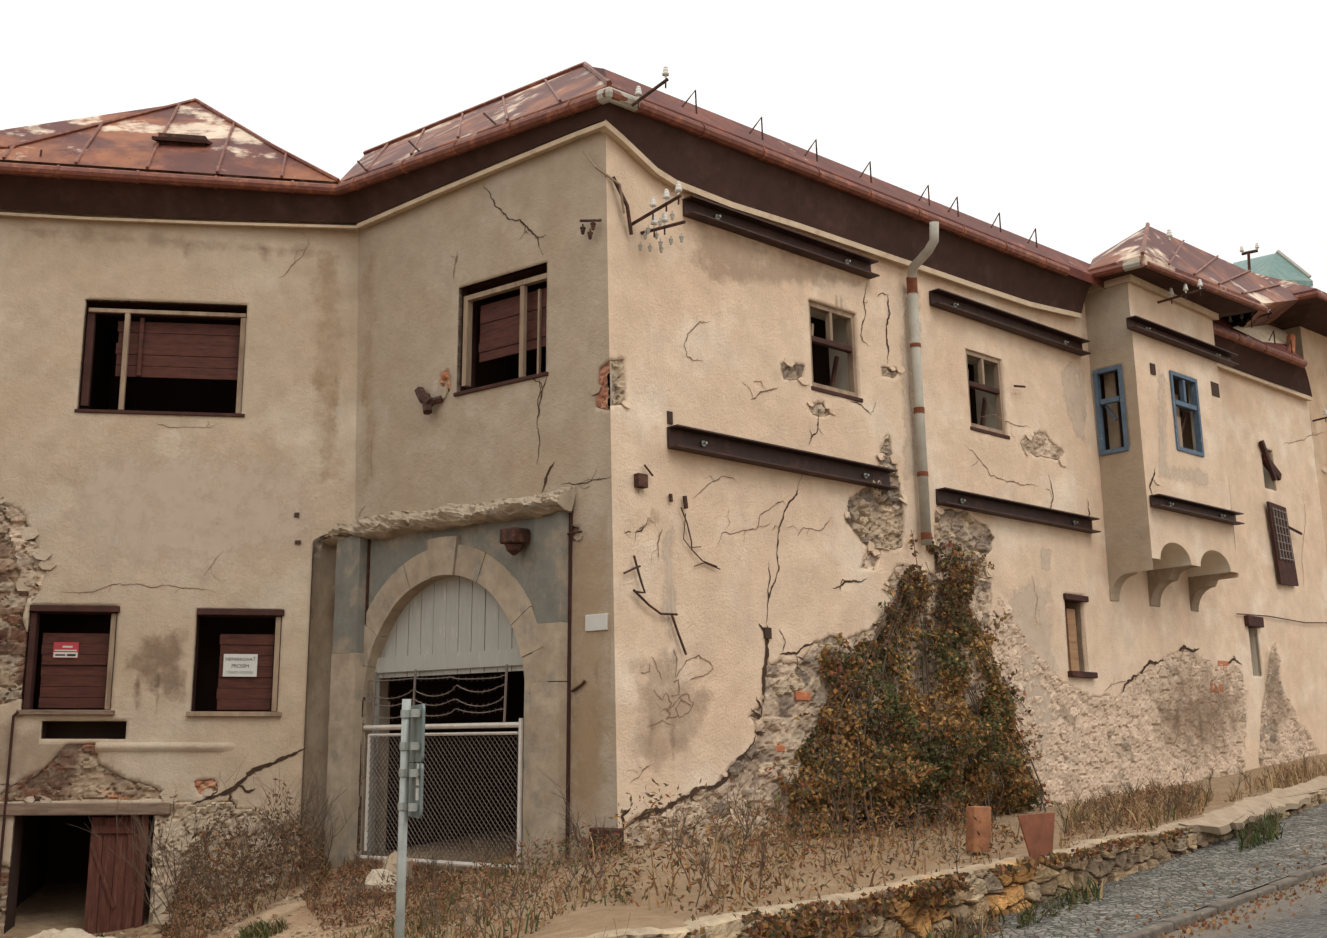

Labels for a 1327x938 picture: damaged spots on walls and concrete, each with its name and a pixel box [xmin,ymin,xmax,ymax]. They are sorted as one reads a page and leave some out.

crack [484,188,543,255]
spalling [589,360,631,410]
spalling [1020,431,1067,467]
spalling [844,434,908,570]
spalling [0,493,56,705]
crack [60,546,233,594]
crack [834,578,867,590]
crack [621,475,833,830]
spalling [624,507,1320,851]
crack [193,748,306,809]
spalling [0,744,301,934]